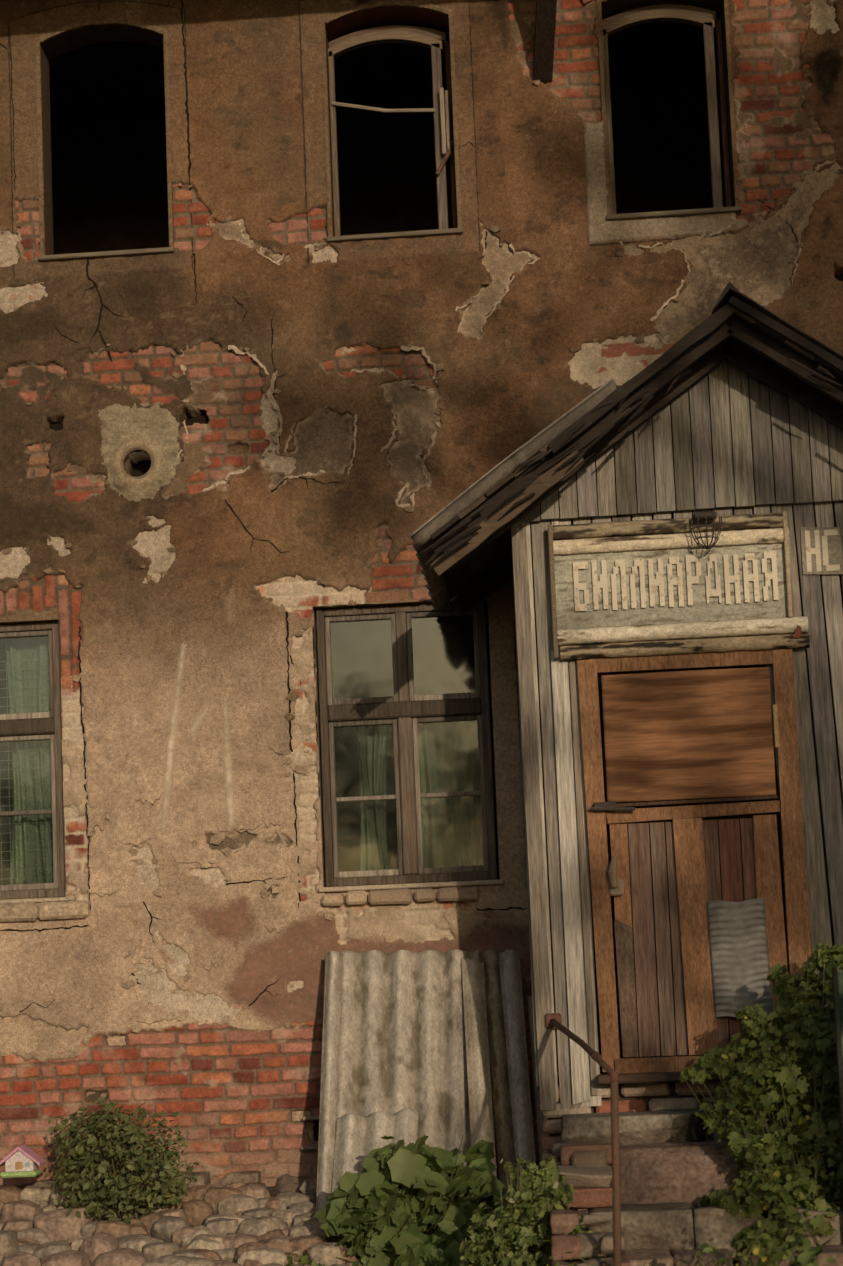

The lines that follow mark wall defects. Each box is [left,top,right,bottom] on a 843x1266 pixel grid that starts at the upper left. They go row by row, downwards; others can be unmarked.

crack [180,0,191,179]
spalling [507,0,602,124]
spalling [0,200,40,267]
crack [54,258,124,362]
peeling [455,223,540,338]
spalling [568,0,843,389]
spalling [0,340,357,503]
peeling [323,341,445,512]
spalling [0,536,96,901]
spalling [189,522,476,944]
spalling [0,931,323,1190]
spalling [525,1020,540,1161]